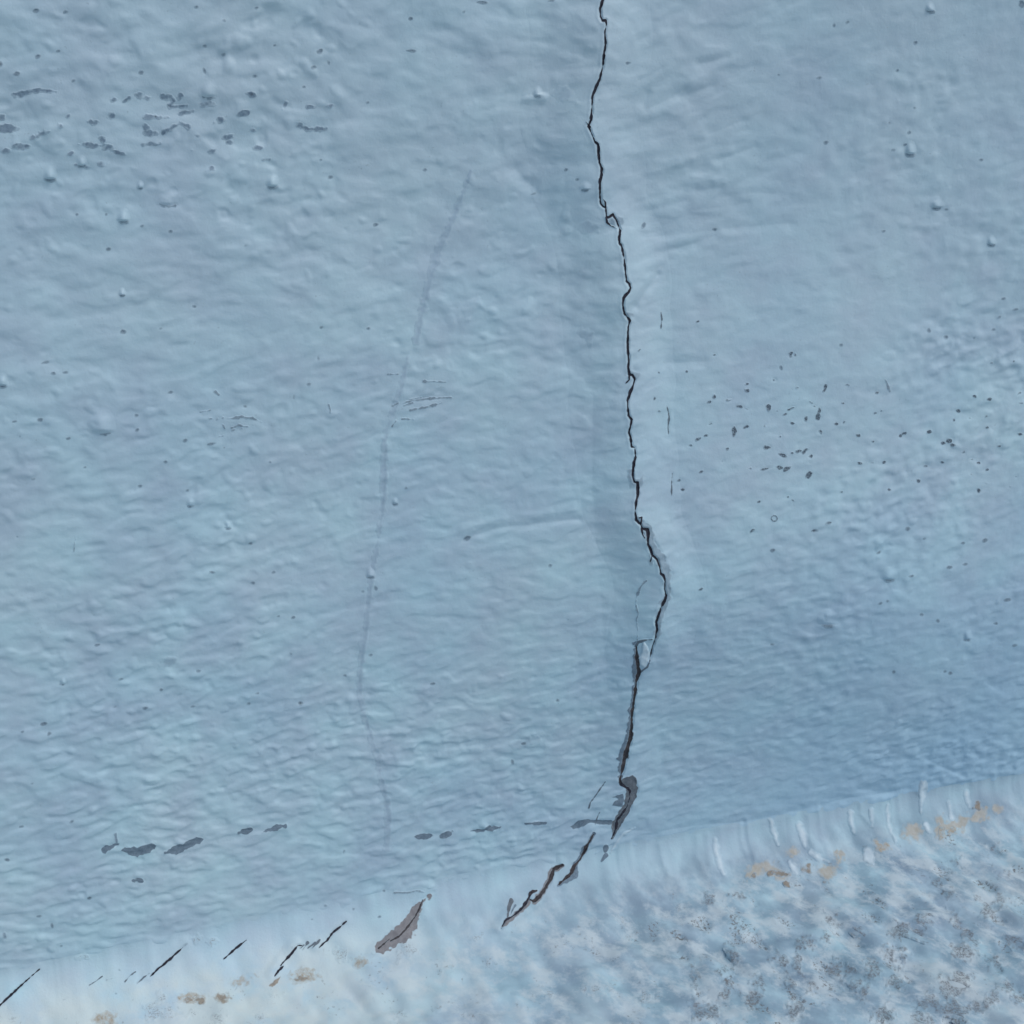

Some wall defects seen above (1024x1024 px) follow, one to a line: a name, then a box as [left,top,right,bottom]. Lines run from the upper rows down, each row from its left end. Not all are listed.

crack [499,0,673,930]
peeling [101,832,204,858]
peeling [236,822,288,835]
peeling [413,830,455,840]
peeling [469,824,502,833]
rust [871,800,1006,859]
rust [743,842,848,888]
crack [88,944,187,986]
crack [222,939,248,960]
crack [269,920,348,987]
crack [0,968,41,1007]